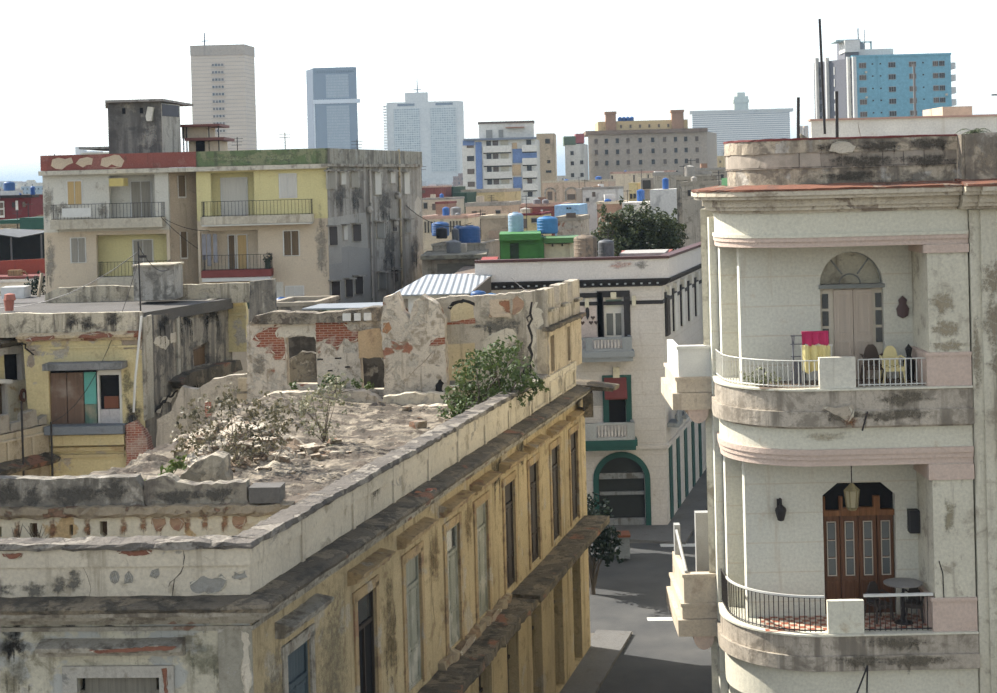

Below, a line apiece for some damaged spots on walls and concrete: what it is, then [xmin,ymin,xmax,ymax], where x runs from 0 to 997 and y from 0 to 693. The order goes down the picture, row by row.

peeling [51,155,124,170]
water stain [335,188,361,206]
water stain [379,193,395,266]
spalling [447,299,475,325]
spalling [512,296,544,329]
water stain [932,265,997,379]
flaking render [253,323,358,372]
flaking render [429,337,445,347]
spalling [480,328,517,364]
water stain [23,570,80,597]
water stain [1,625,29,692]